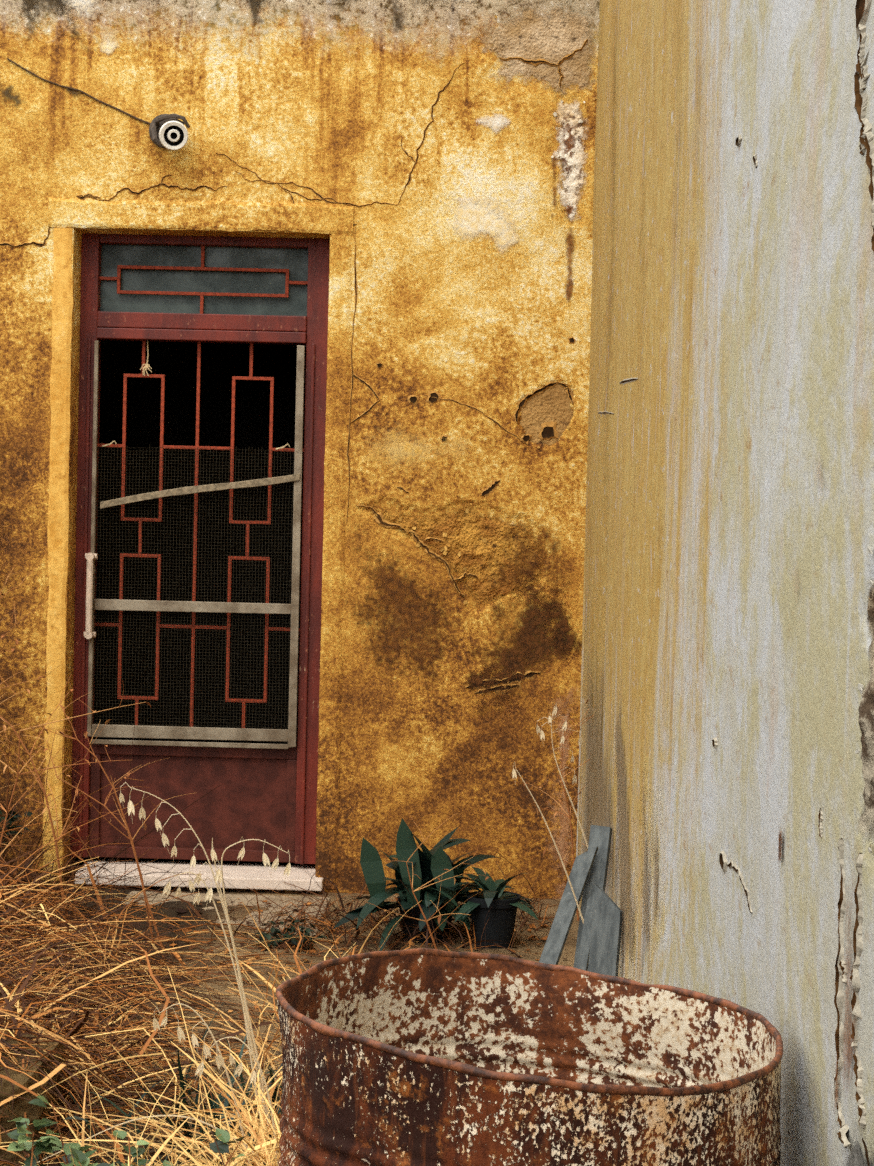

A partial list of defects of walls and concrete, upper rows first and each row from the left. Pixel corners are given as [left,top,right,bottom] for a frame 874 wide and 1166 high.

leakage [23,0,95,36]
leakage [249,0,264,22]
crack [499,39,588,88]
peeling [476,114,510,133]
flaking render [482,7,598,219]
crack [0,227,51,248]
crack [76,62,466,522]
crack [513,381,574,423]
spalling [855,580,874,854]